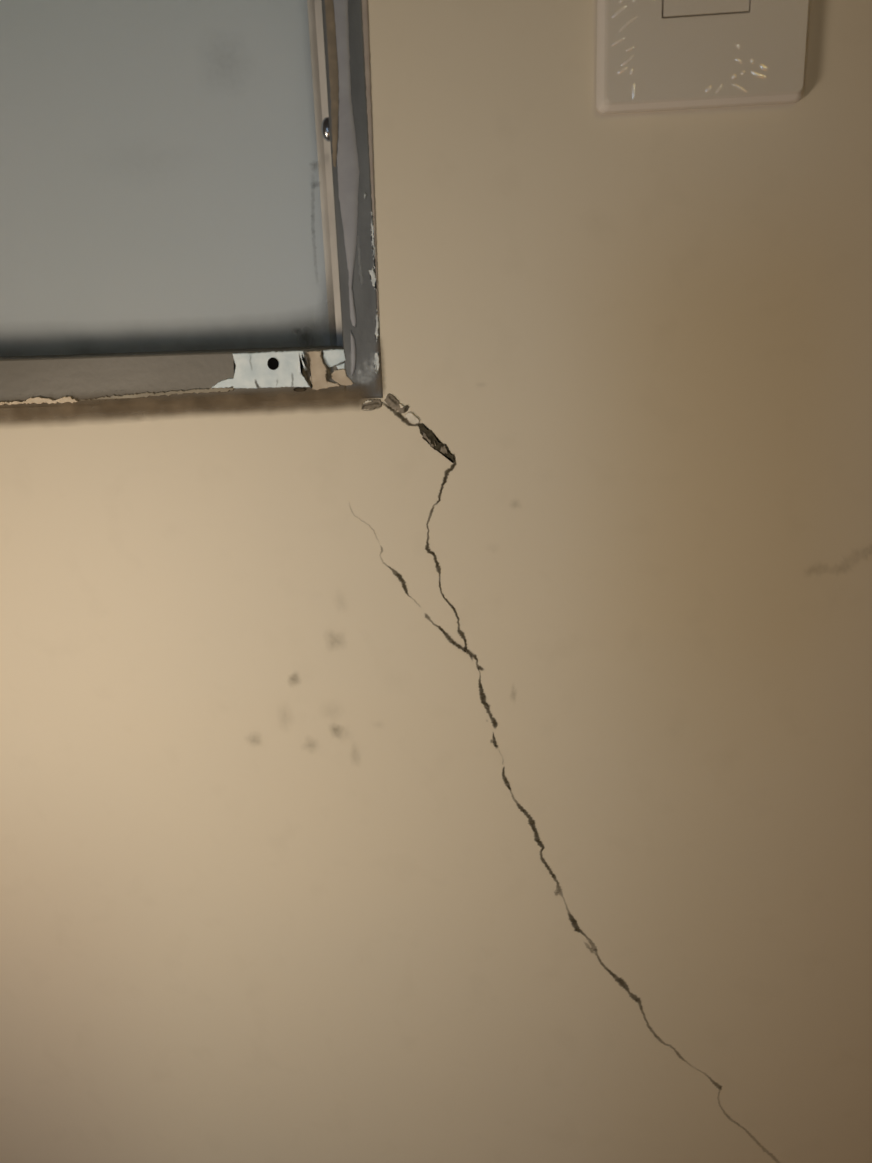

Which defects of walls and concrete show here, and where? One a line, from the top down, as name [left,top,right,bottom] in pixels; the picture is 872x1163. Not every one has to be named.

crack [361,393,559,887]
crack [569,913,584,935]
crack [599,960,657,1037]